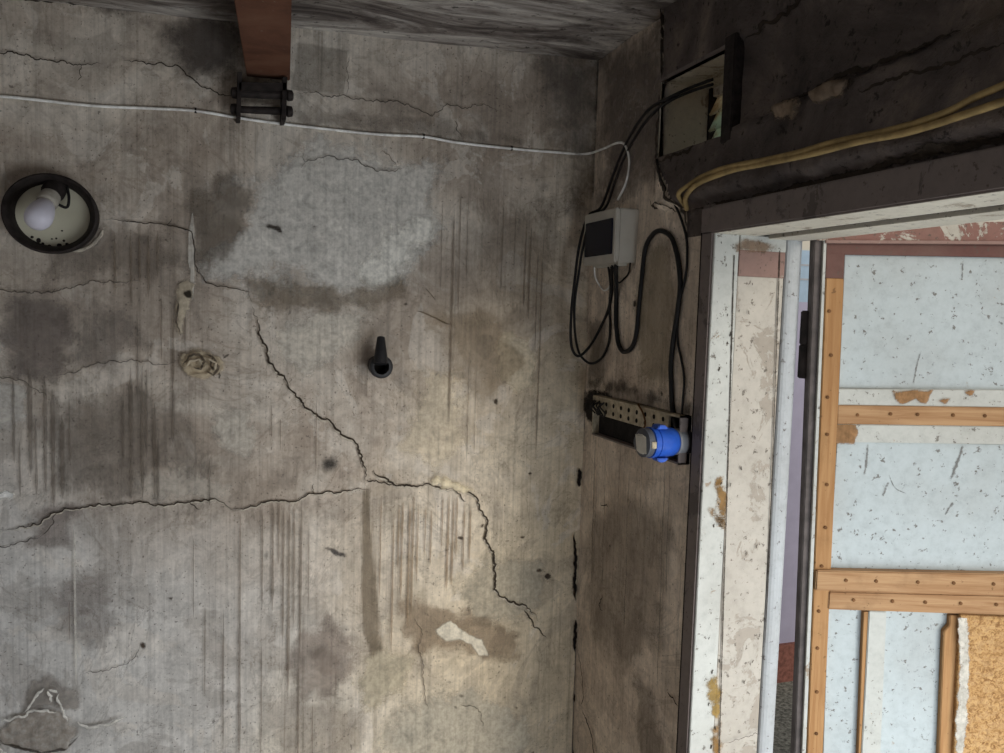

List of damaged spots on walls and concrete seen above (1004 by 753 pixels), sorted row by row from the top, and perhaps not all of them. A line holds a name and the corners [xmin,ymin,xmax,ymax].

crack [0,51,98,80]
crack [125,60,230,96]
spalling [770,79,847,119]
crack [764,30,1004,115]
crack [649,99,1004,228]
leakage [188,134,443,301]
leakage [278,313,360,375]
crack [0,219,546,637]
crack [575,468,583,487]
spalling [436,621,488,656]
crack [573,534,602,753]
spalling [0,678,126,753]